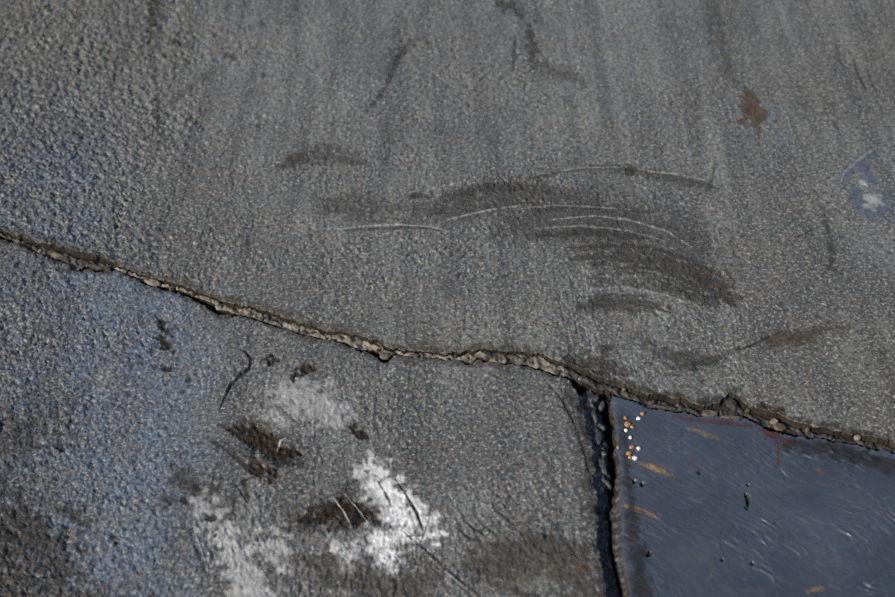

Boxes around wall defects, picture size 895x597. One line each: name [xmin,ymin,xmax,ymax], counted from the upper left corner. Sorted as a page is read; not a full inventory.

rust [738,87,774,137]
crack [0,229,895,597]